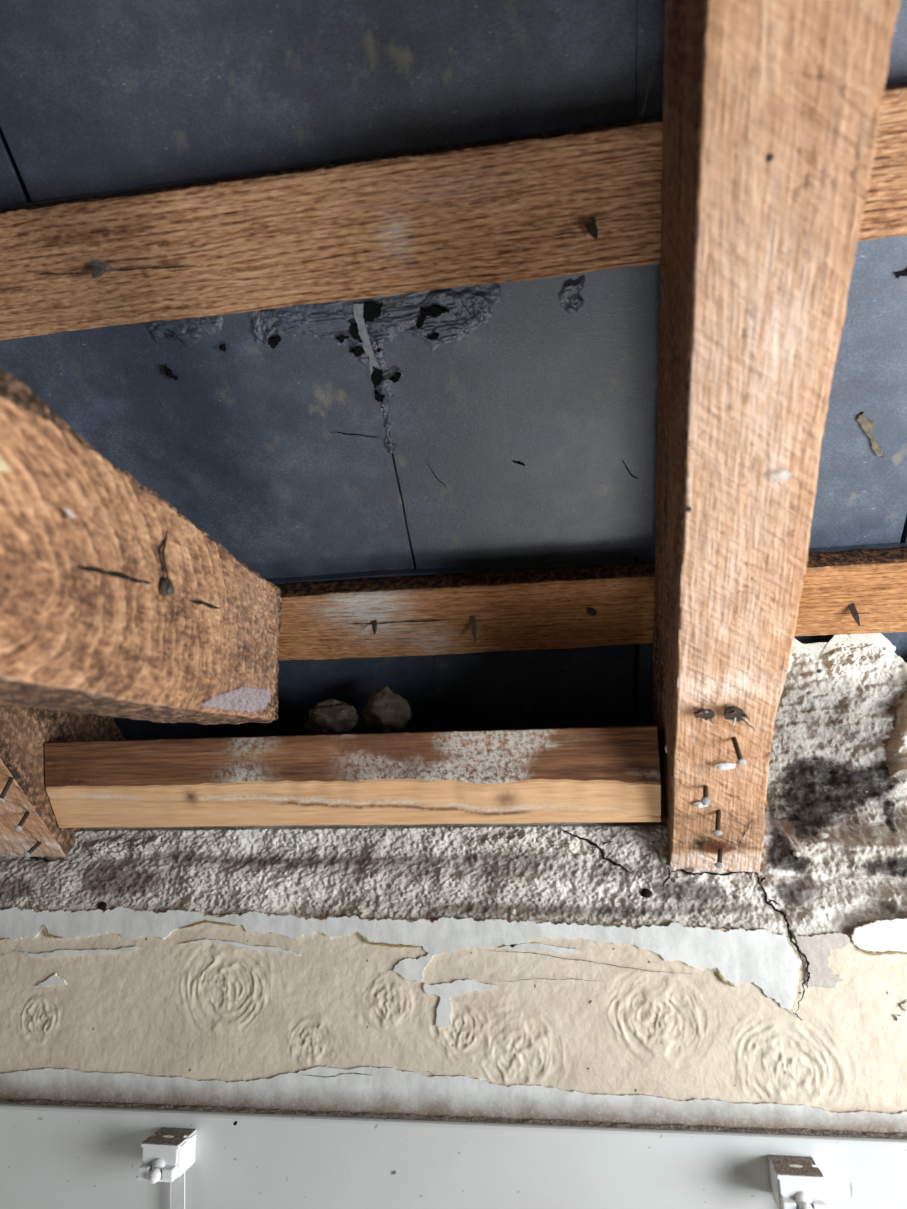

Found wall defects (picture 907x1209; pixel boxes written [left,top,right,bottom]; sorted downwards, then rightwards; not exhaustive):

spalling [558,276,585,314]
spalling [145,316,227,352]
spalling [247,283,501,454]
crack [561,828,632,874]
leakage [766,757,900,904]
leakage [863,856,907,878]
peeling [0,906,907,1027]
crack [662,867,810,1020]
peeling [0,1066,907,1133]